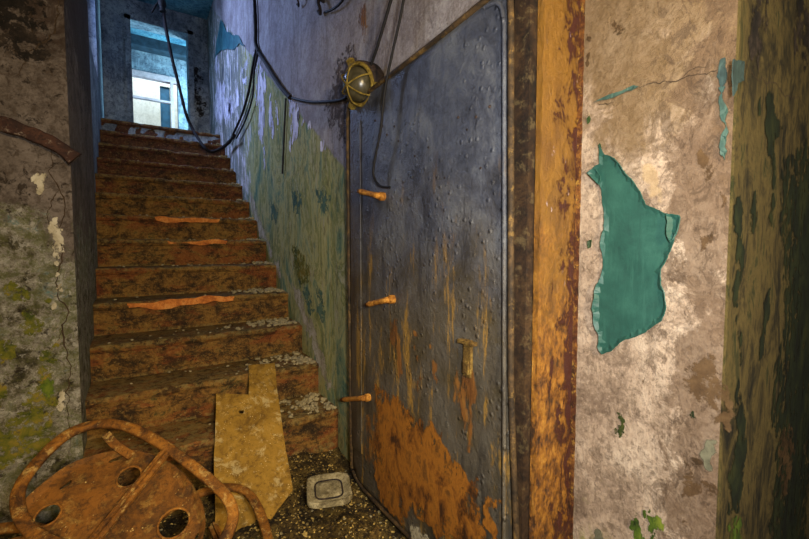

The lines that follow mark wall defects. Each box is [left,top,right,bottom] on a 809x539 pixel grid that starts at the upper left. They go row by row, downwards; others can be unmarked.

water stain [324,42,357,148]
flaking render [717,57,745,161]
peeling [587,143,681,355]
flaking render [700,231,713,251]
water stain [733,191,758,367]
water stain [759,288,771,361]
corrosion [365,384,502,539]
corrosion [453,371,477,453]
water stain [629,509,665,539]
flaking render [682,457,719,497]
flaking render [683,355,735,432]
water stain [728,380,747,516]